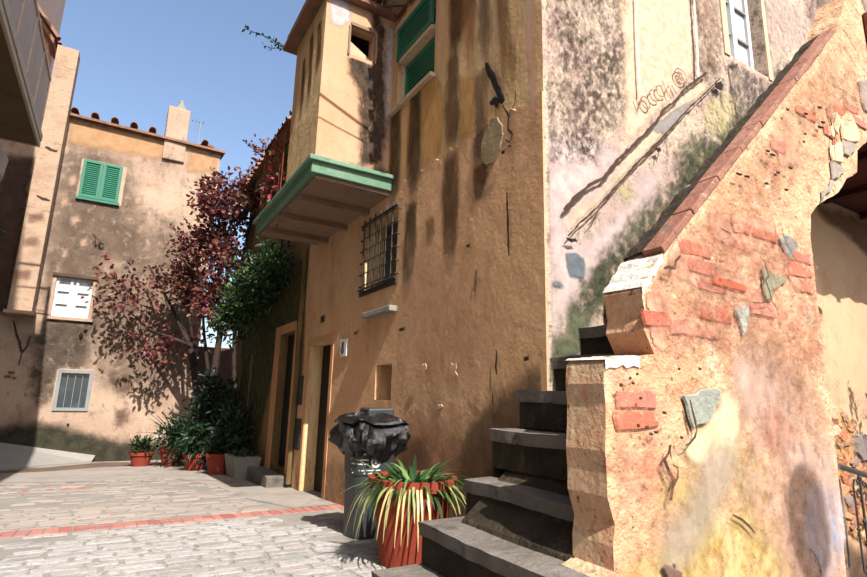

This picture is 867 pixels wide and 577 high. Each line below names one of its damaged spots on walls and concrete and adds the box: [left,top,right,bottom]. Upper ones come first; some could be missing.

water stain [350,14,421,193]
water stain [445,0,514,142]
water stain [547,0,661,318]
flaking render [764,133,807,185]
flaking render [795,97,867,202]
water stain [0,151,189,402]
water stain [404,153,458,287]
flaking render [641,293,732,350]
flaking render [668,211,777,319]
flaking render [785,251,825,329]
water stain [0,423,167,462]
flaking render [613,372,667,436]